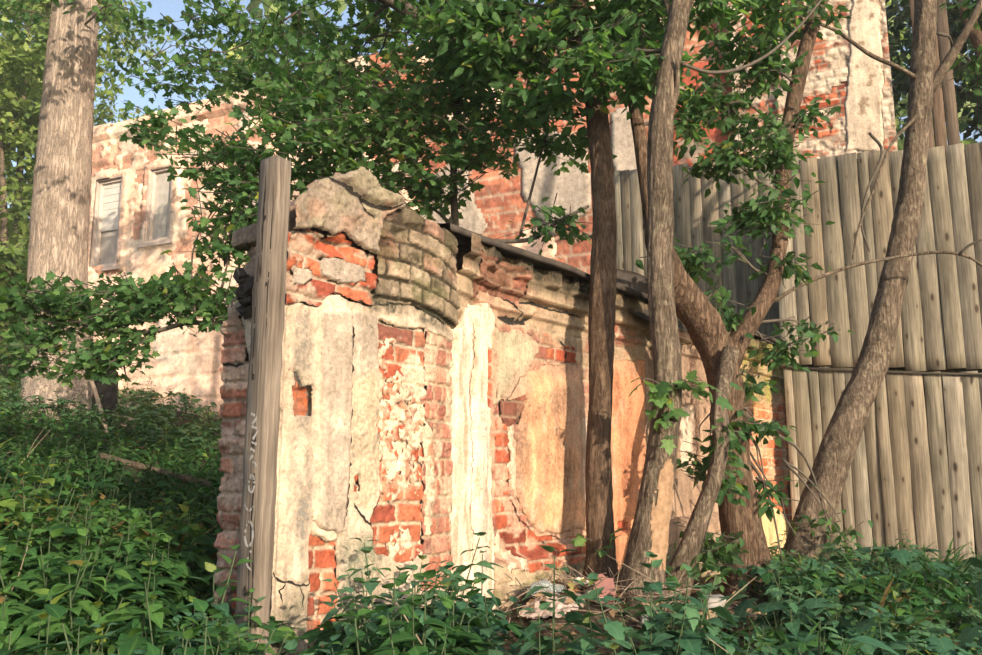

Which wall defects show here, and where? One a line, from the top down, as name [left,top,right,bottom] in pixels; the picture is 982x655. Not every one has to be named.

crack [317,175,406,218]
spalling [285,229,377,306]
flaking render [546,346,577,364]
spalling [292,376,308,416]
crack [344,316,380,531]
flaking render [370,320,453,590]
flaking render [487,350,586,573]
crack [273,573,310,608]
flaking render [306,521,339,648]